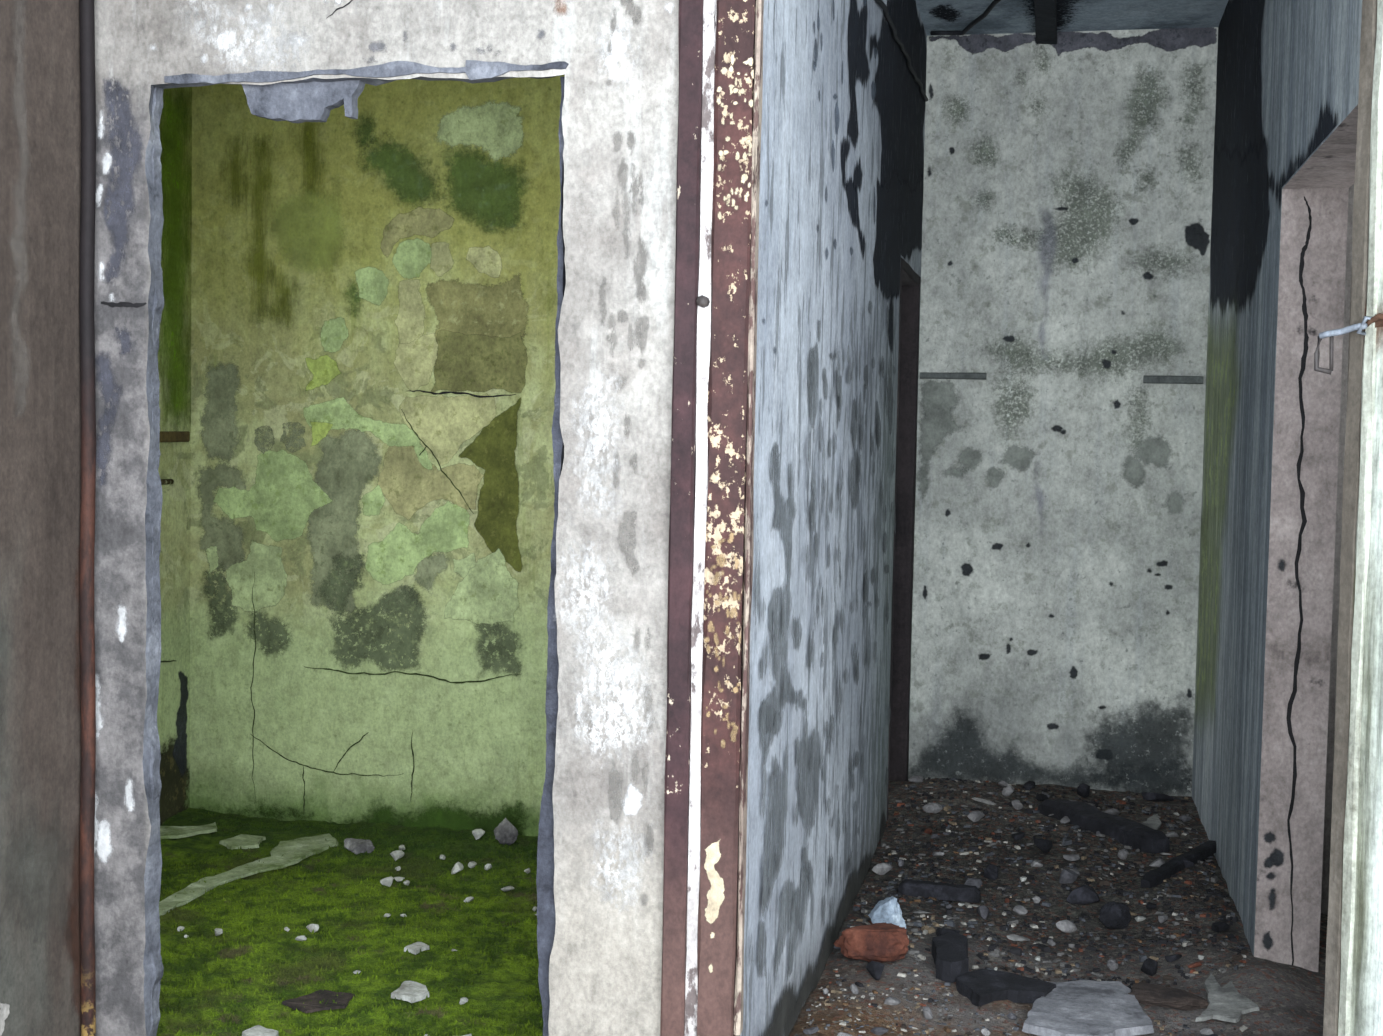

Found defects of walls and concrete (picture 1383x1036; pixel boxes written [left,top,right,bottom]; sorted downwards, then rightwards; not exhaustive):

peeling [813,0,835,71]
peeling [818,61,843,202]
damp [840,0,927,352]
crack [161,660,188,777]
crack [250,573,415,815]
damp [315,554,427,671]
spalling [94,0,655,1036]
crack [304,666,518,683]
peeling [704,321,896,979]
damp [909,0,1271,796]
crack [1286,196,1312,965]
damp [759,811,887,1036]